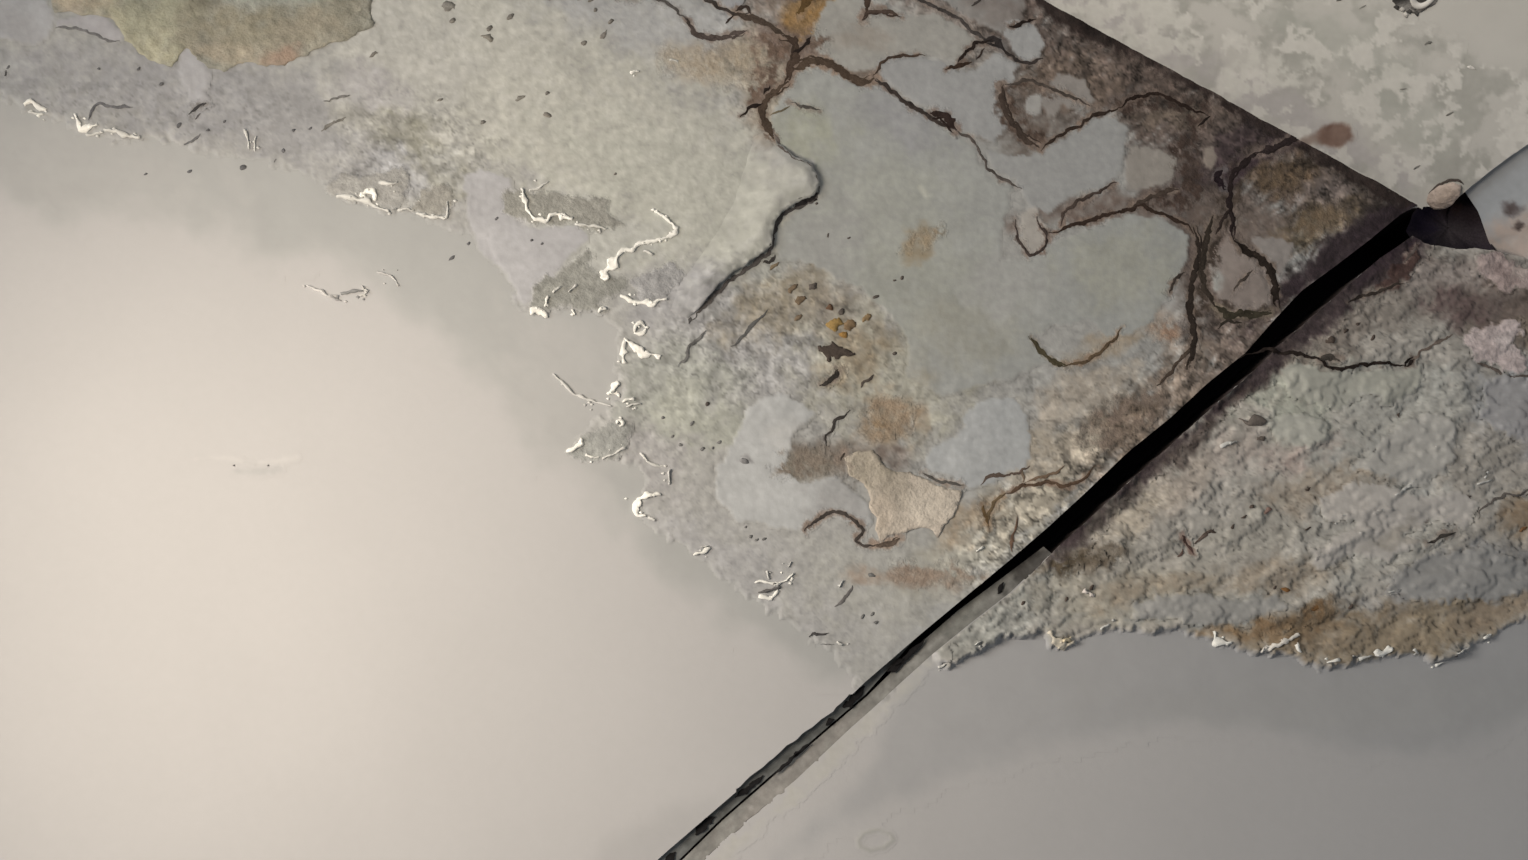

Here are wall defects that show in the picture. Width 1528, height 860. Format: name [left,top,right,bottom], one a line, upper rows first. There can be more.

corrosion [655,0,828,92]
flaking render [0,0,1292,690]
flaking render [936,0,1528,674]
crack [814,362,874,463]
crack [799,507,908,552]
crack [915,460,1102,551]
crack [1174,527,1214,559]
crack [1421,487,1528,552]
crack [809,586,853,645]
water stain [758,575,1528,860]